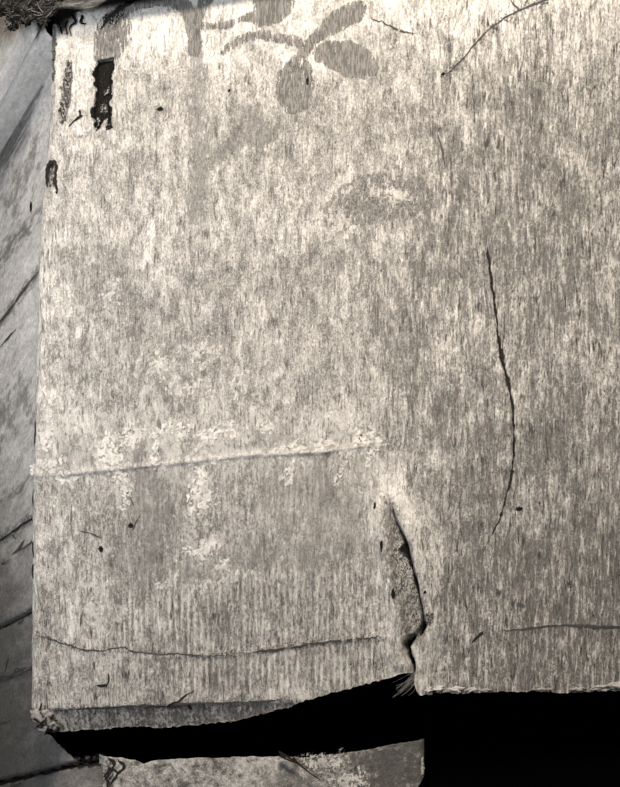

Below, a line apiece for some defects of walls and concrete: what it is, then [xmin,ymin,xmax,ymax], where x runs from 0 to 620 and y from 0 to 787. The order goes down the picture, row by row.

crack [441,0,559,83]
spalling [90,59,115,131]
peeling [45,159,58,190]
crack [480,237,516,557]
crack [0,612,387,714]
crack [503,623,620,631]